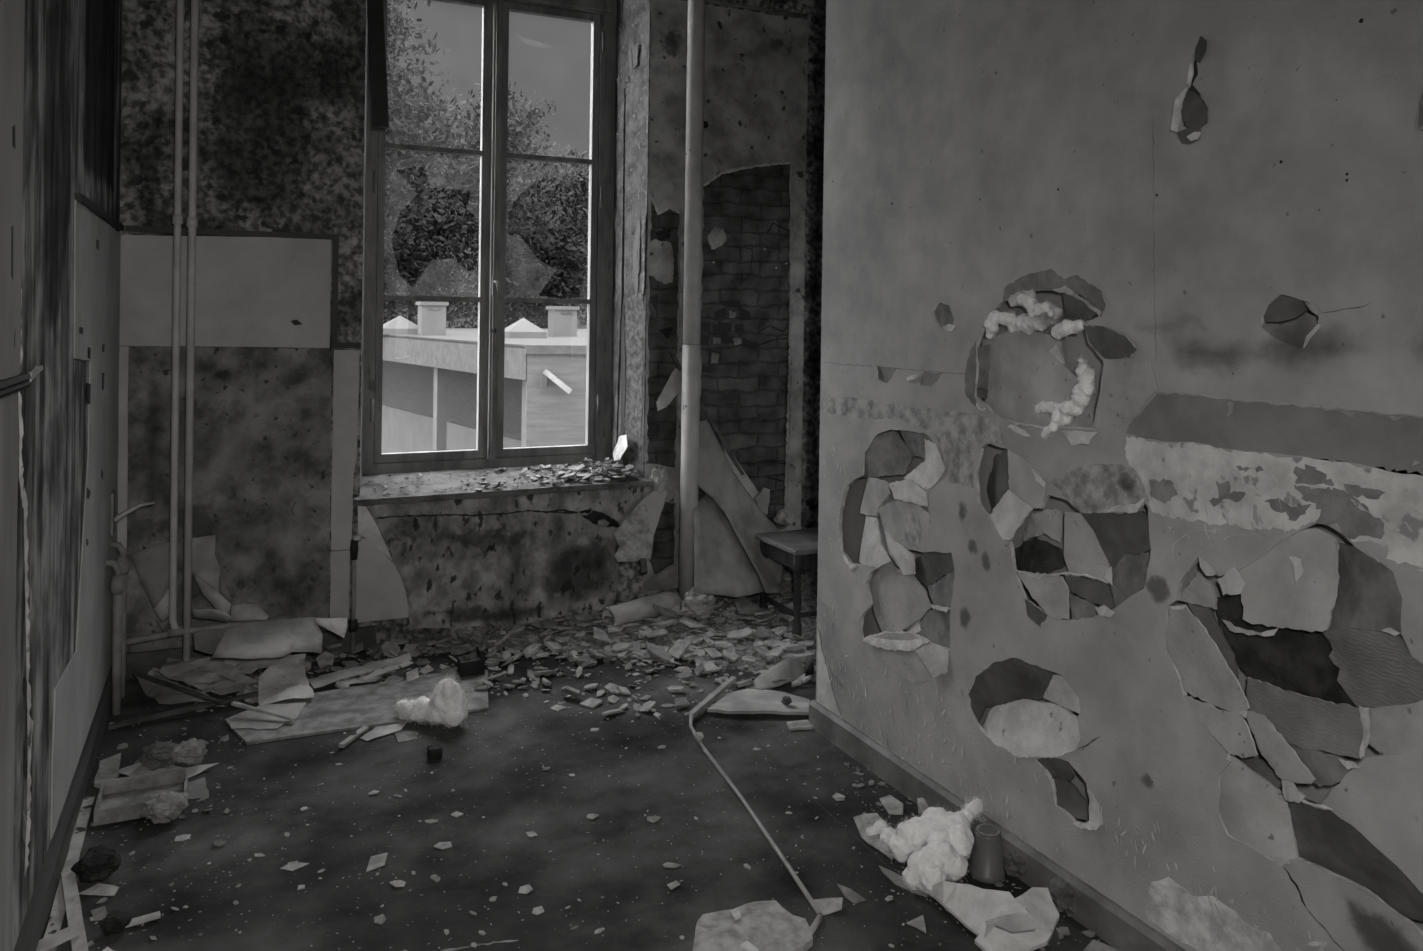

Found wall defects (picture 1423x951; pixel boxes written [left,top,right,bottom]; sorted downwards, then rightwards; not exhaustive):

flaking render [1170,36,1208,143]
flaking render [579,509,621,527]
flaking render [701,162,794,528]
spalling [814,269,1423,951]